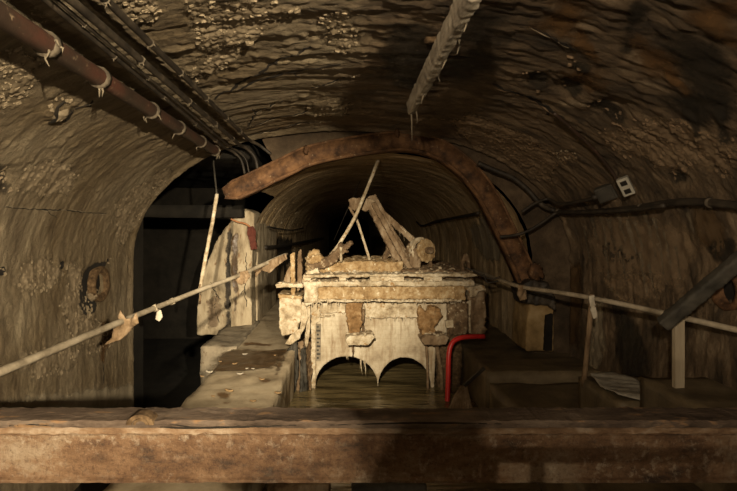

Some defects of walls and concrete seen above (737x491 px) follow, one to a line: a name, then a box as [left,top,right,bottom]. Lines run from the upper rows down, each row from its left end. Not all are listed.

damp [381,23,429,90]
damp [443,12,511,79]
damp [661,33,736,144]
damp [224,229,239,327]